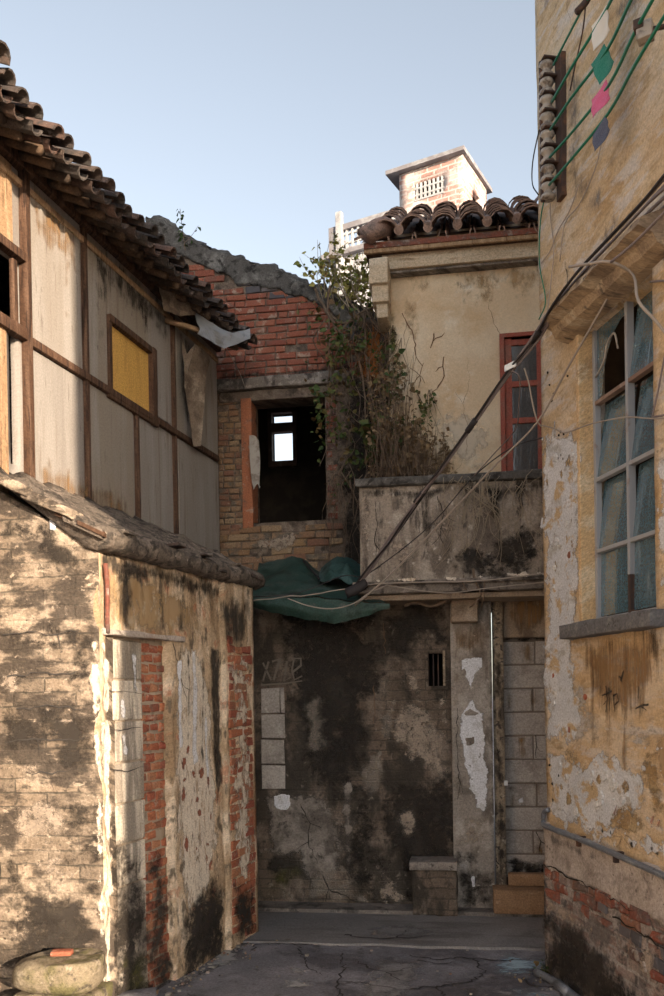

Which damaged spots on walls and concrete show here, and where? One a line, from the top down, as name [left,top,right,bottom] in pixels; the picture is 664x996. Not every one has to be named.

water stain [446,525,544,581]
water stain [26,621,93,679]
peeling [540,421,664,855]
water stain [3,709,96,769]
water stain [16,802,96,843]
flaking render [227,636,256,937]
water stain [283,607,491,904]
peeling [460,709,487,760]
water stain [7,860,98,959]
crack [241,927,545,996]
water stain [498,901,635,996]
flaking render [545,869,664,984]